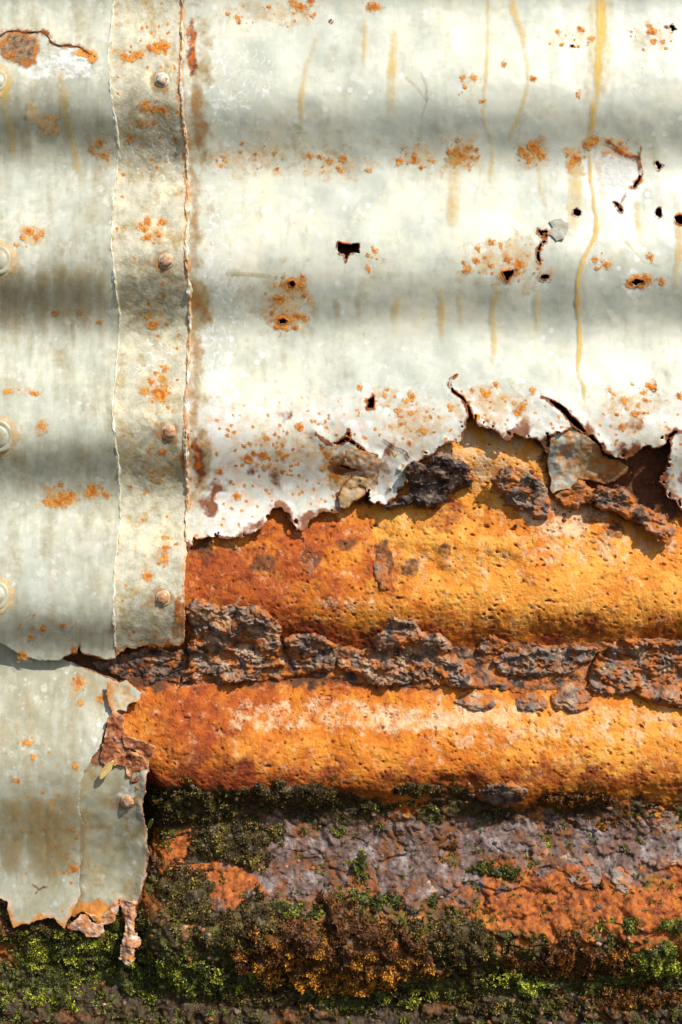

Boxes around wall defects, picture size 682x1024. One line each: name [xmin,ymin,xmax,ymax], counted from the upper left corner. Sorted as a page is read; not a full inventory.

rust [180,11,206,144]
damp [590,0,606,134]
damp [573,156,598,370]
rust [42,481,109,508]
rust [150,391,224,485]
peeling [338,447,381,509]
rust [383,451,474,511]
rust [491,466,675,546]
peeling [547,428,628,494]
rust [88,535,682,714]
peeling [106,680,142,715]
rust [100,711,156,809]